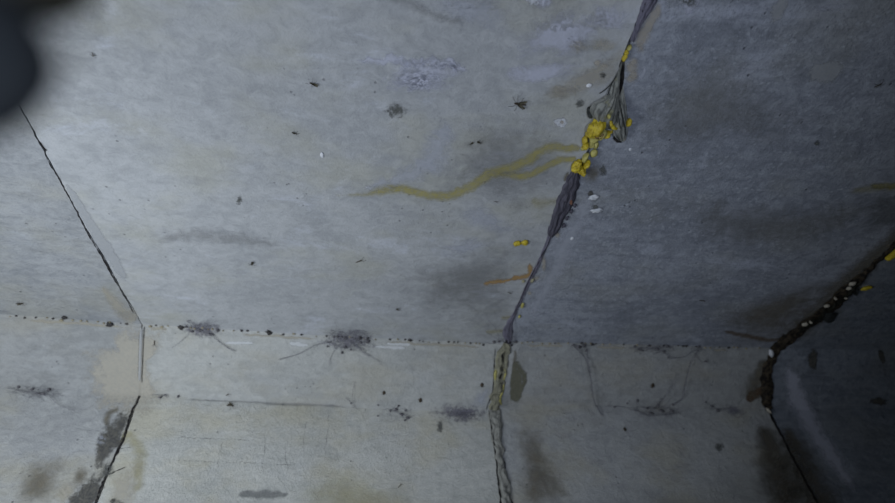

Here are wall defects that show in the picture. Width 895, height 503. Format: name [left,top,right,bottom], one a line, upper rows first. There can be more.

water stain [372,128,579,199]
crack [31,127,134,313]
crack [95,396,140,503]
crack [486,354,506,503]
crack [769,409,818,503]